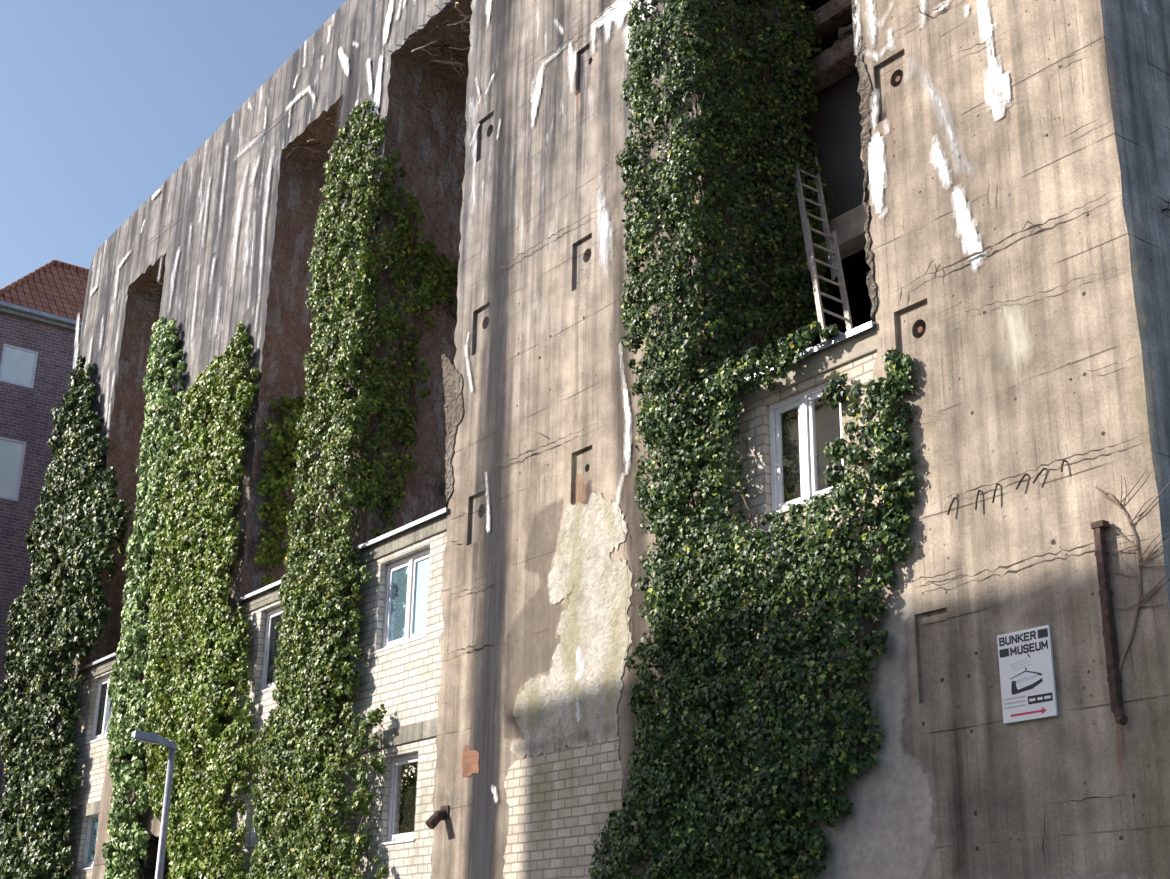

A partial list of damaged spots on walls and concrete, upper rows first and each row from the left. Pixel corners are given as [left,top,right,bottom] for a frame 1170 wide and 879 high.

water stain [532,0,576,126]
spalling [852,0,879,319]
crack [896,191,1116,303]
water stain [465,0,562,879]
crack [931,432,1150,505]
crack [915,528,1151,588]
flaking render [503,491,633,879]